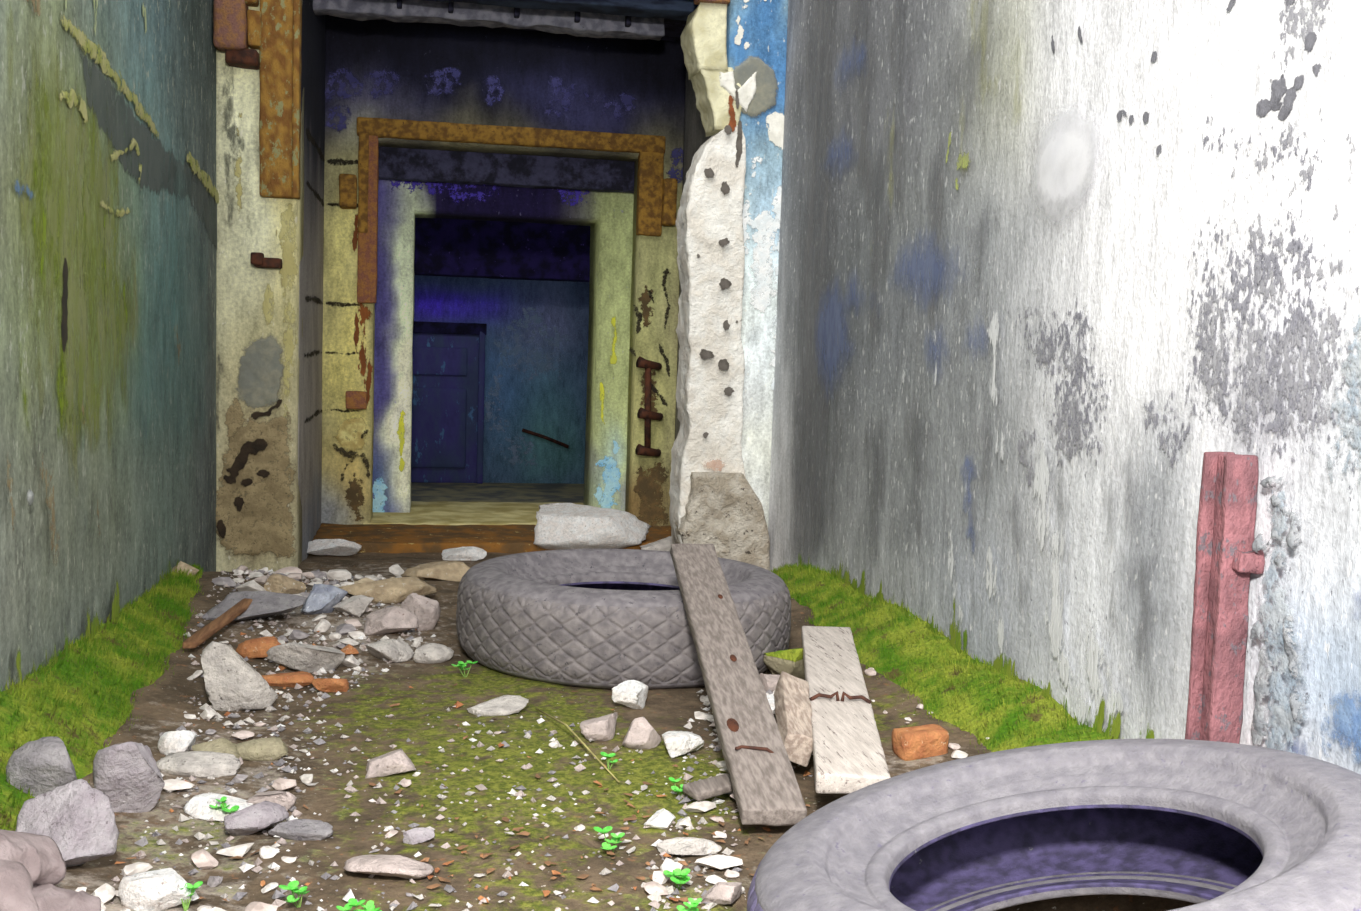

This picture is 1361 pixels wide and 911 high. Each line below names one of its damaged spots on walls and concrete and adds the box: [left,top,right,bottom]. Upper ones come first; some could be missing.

spalling [59,16,219,251]
peeling [325,68,400,132]
peeling [425,67,461,95]
peeling [484,76,505,106]
spalling [666,0,784,570]
rust [353,303,373,406]
spalling [216,335,296,558]